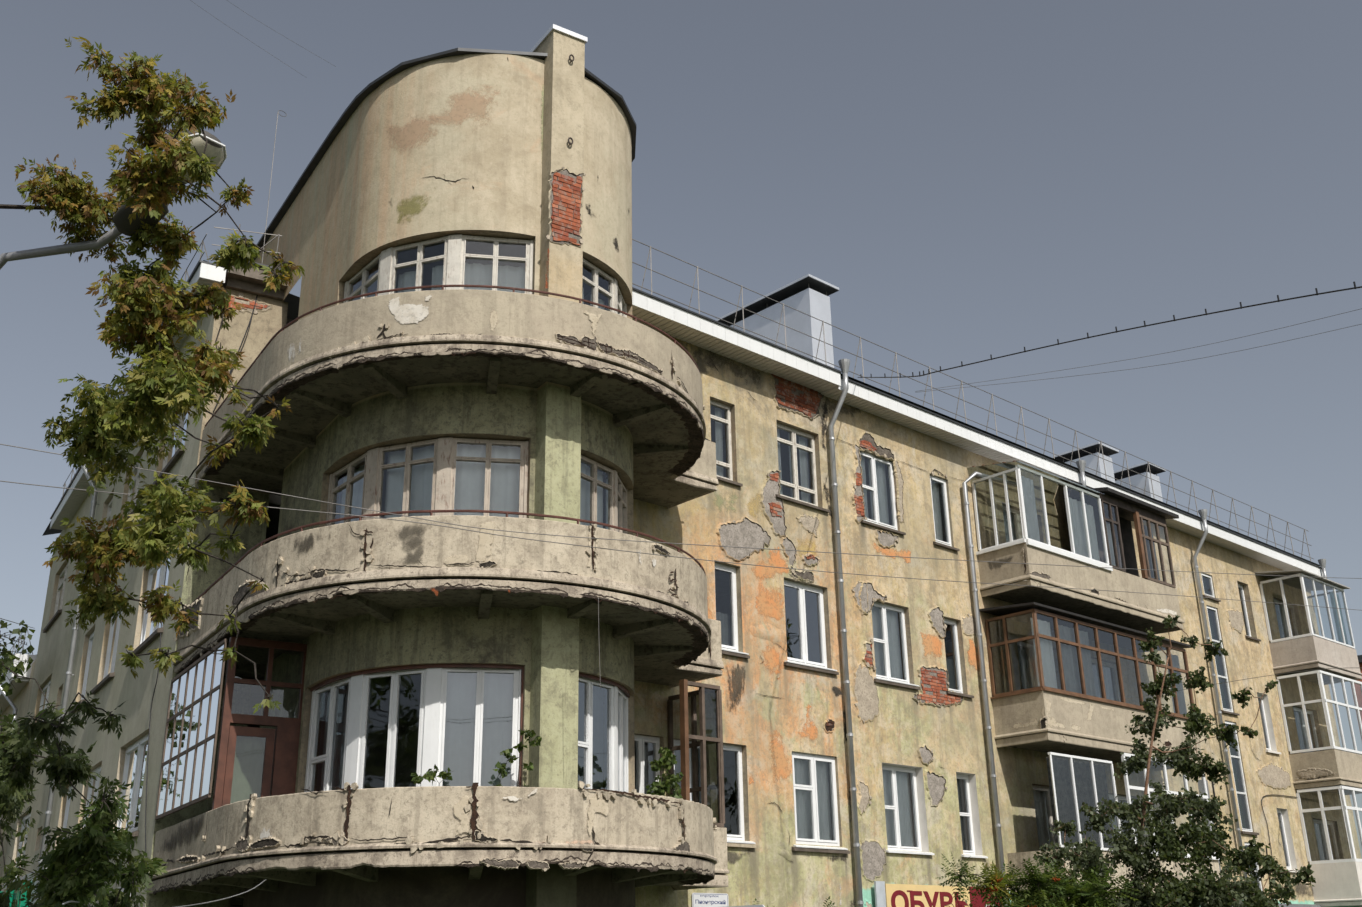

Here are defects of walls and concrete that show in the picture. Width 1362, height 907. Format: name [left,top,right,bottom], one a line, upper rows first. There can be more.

flaking render [546,168,585,248]
spalling [195,293,704,500]
flaking render [767,372,824,420]
flaking render [851,431,911,563]
flaking render [716,469,820,620]
flaking render [852,580,887,616]
leakage [727,664,746,711]
flaking render [912,606,980,708]
flaking render [917,743,948,808]
spalling [153,836,282,895]
crack [156,782,551,872]
spalling [453,795,715,885]